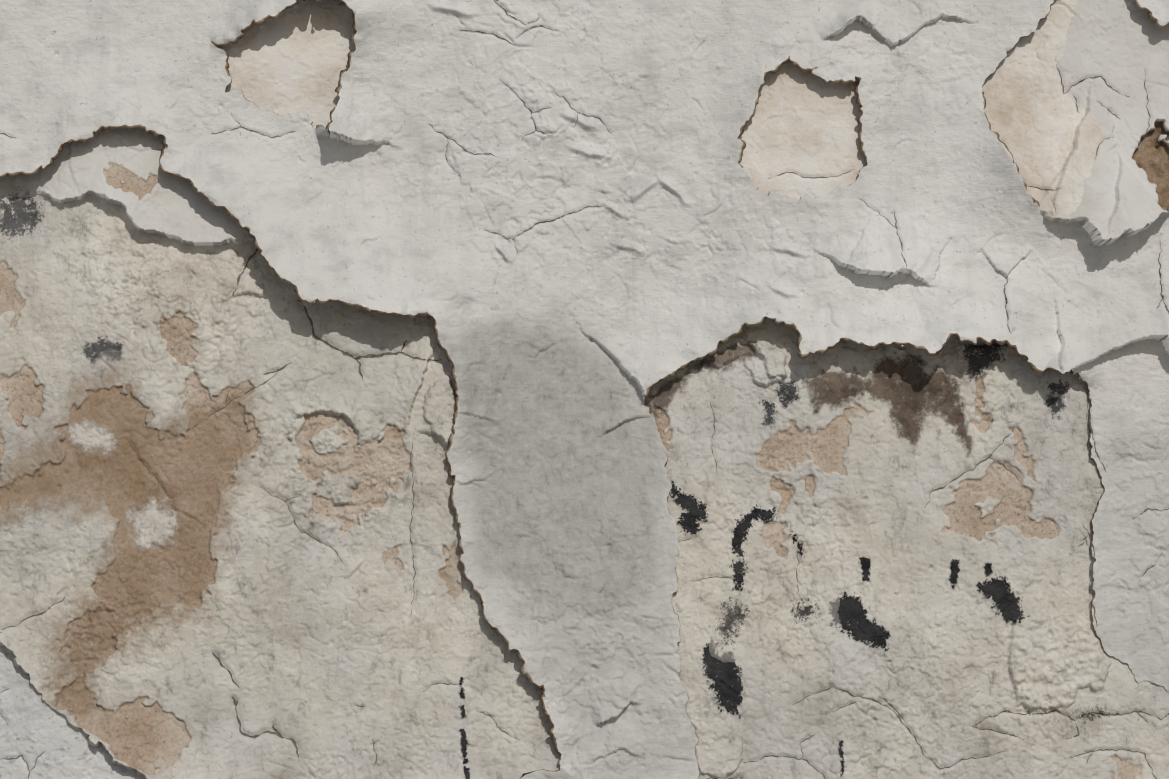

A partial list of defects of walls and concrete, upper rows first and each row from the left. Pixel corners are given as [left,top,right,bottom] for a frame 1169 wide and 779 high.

peeling [205,0,368,128]
crack [430,124,495,177]
crack [502,82,609,140]
peeling [730,38,874,200]
mould [0,186,45,243]
crack [487,206,603,253]
peeling [0,87,568,779]
water stain [647,343,757,416]
water stain [759,341,1009,453]
mould [1045,379,1069,419]
peeling [644,274,1169,779]
crack [1080,525,1097,623]